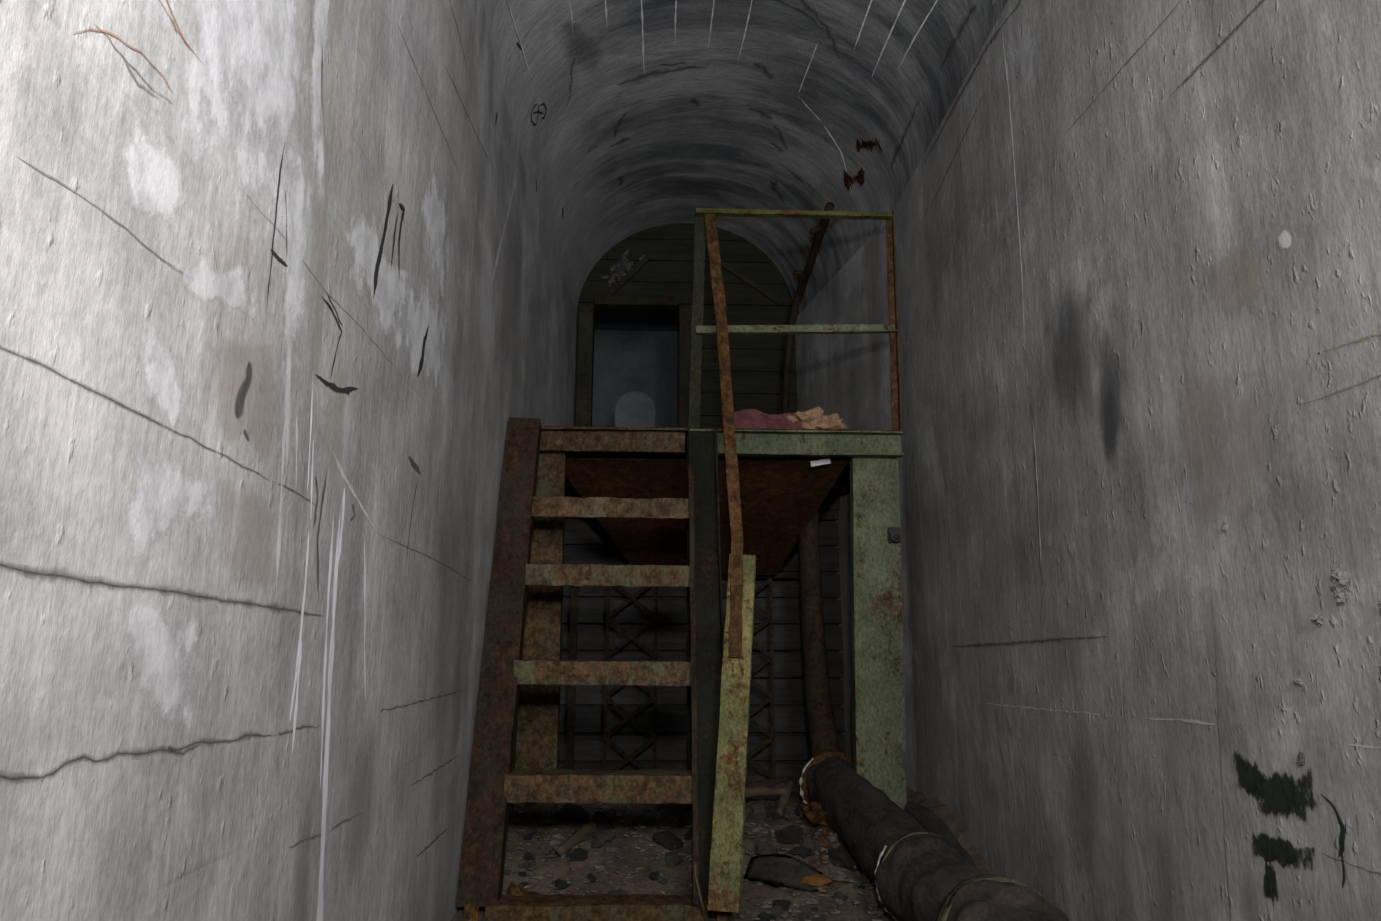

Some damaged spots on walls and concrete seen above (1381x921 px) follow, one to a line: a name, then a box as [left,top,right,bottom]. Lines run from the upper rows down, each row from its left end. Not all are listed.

crack [0,347,315,505]
crack [0,563,320,616]
water stain [276,334,314,753]
crack [0,726,317,780]
water stain [316,488,345,921]